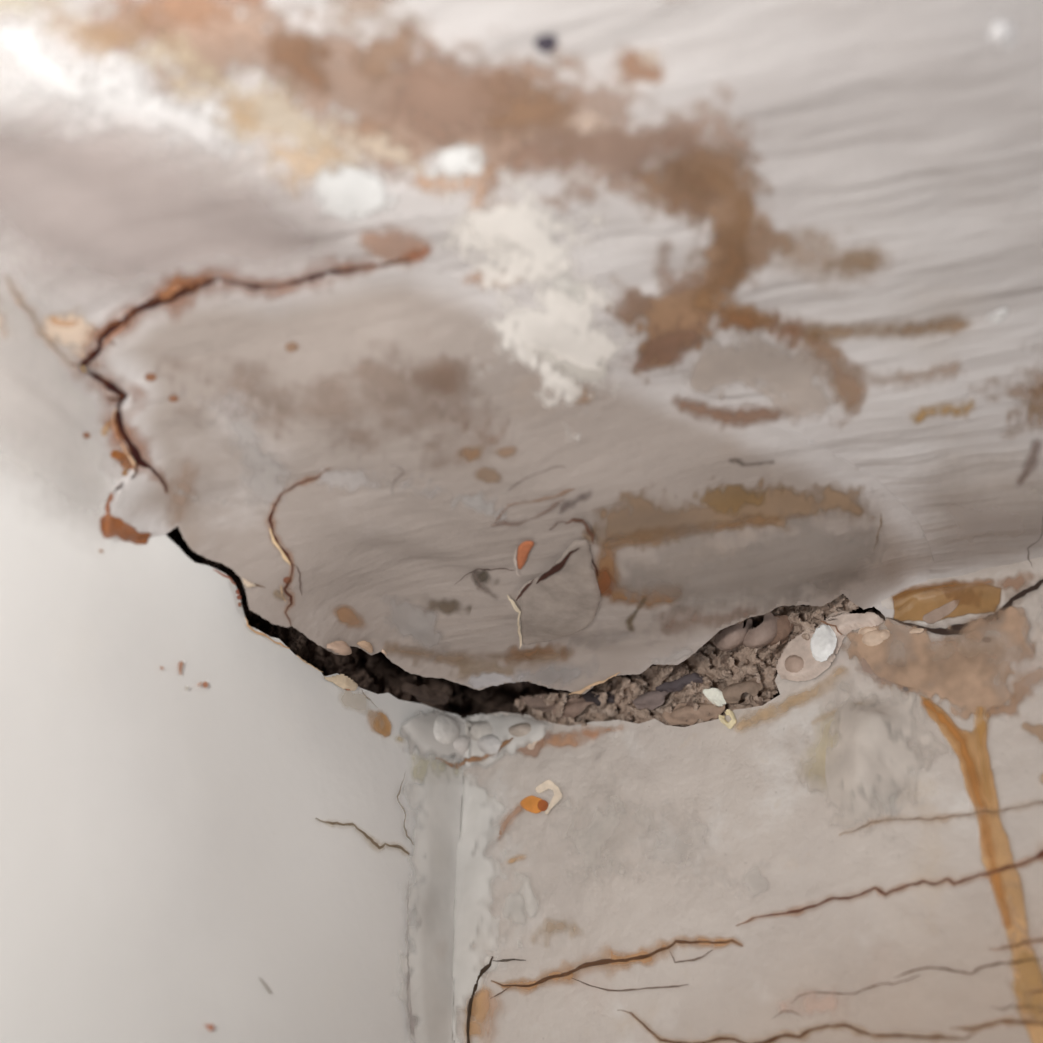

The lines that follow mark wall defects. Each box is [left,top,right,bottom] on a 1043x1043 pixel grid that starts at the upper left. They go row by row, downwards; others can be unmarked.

damp [0,138,299,272]
damp [88,0,876,409]
crack [54,259,410,493]
damp [677,401,791,426]
damp [885,320,965,335]
crack [268,468,331,625]
flaking render [166,518,1034,727]
rust [893,576,1024,624]
crack [885,546,1043,635]
crack [315,770,414,855]
crack [466,850,1043,1043]
rust [921,696,1043,1043]